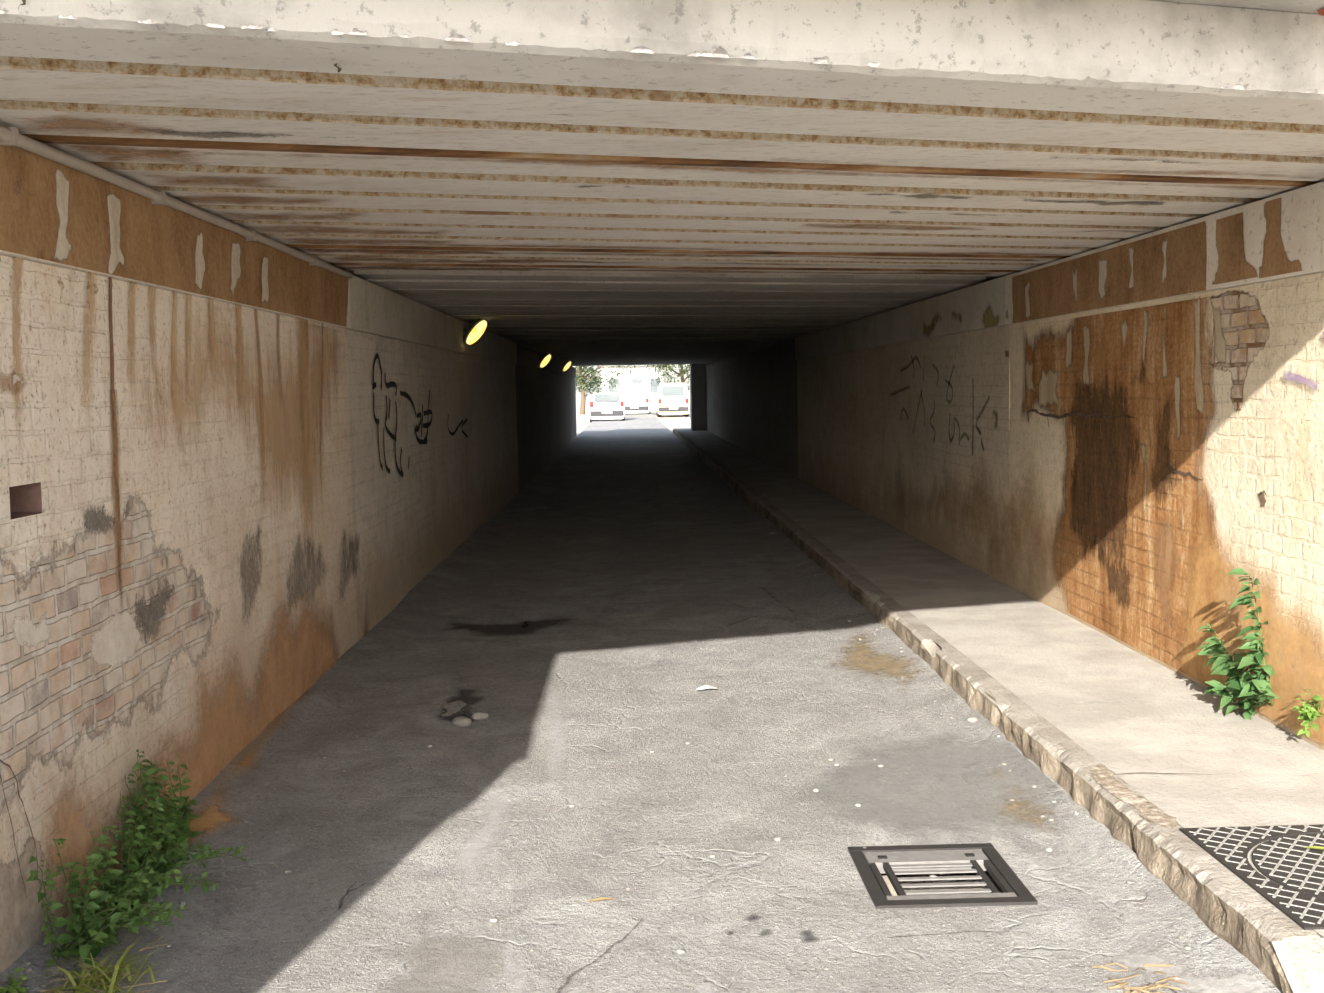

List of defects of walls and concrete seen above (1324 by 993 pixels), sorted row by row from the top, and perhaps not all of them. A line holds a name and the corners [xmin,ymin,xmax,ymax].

rust [38,118,145,133]
rust [0,145,858,597]
peeling [1211,290,1270,411]
hole [9,482,42,519]
damp [84,502,130,531]
mould [240,528,262,618]
mould [287,537,324,610]
mould [340,530,359,596]
damp [134,580,175,642]
peeling [0,496,220,814]
flaking render [0,837,54,974]
crack [556,922,640,993]